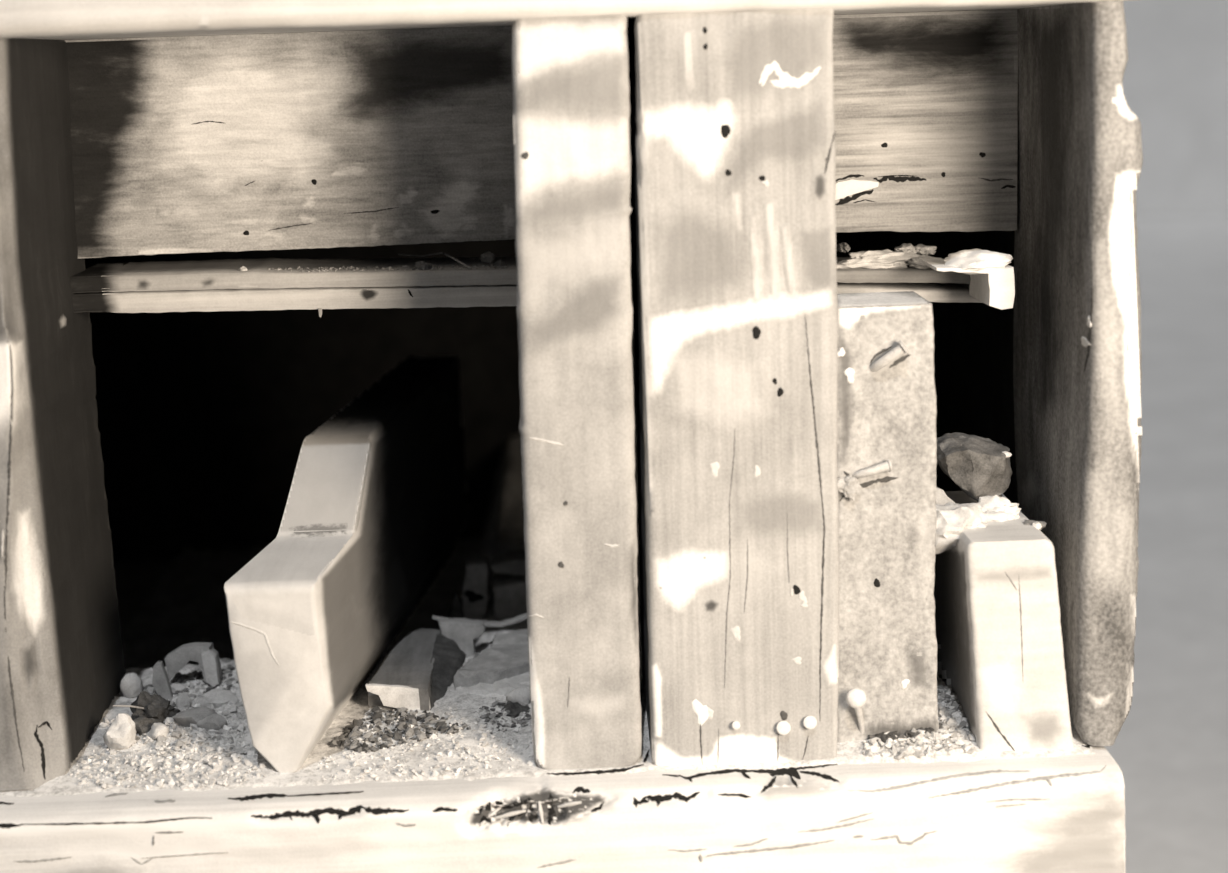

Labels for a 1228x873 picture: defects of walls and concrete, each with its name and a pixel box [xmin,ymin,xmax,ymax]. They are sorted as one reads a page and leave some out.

crack [824,131,926,205]
crack [4,389,52,780]
crack [633,317,1106,862]
crack [0,791,458,865]